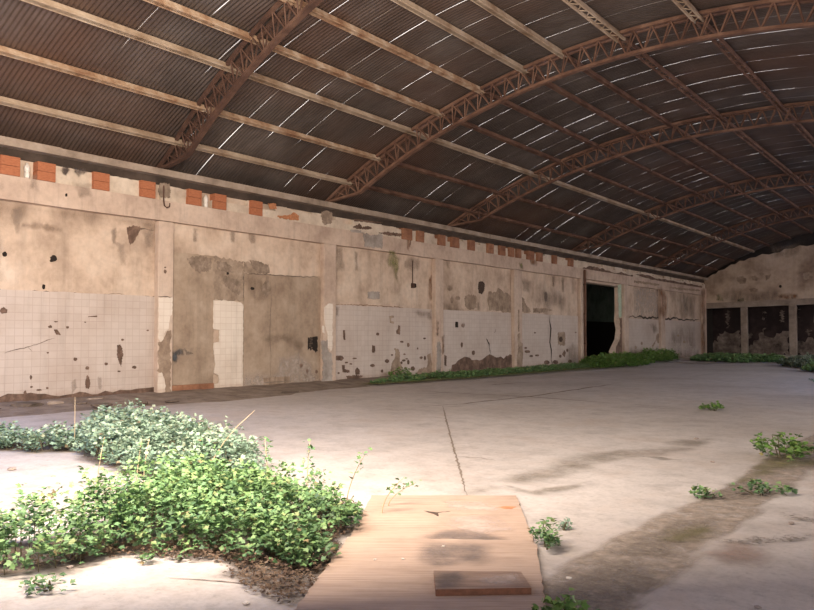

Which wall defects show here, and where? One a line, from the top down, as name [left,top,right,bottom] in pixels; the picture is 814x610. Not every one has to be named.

spalling [127,225,148,245]
flaking render [187,255,271,298]
peeling [0,330,172,402]
spalling [299,326,363,381]
peeling [370,281,572,376]
peeling [713,310,814,355]
crack [430,382,610,493]